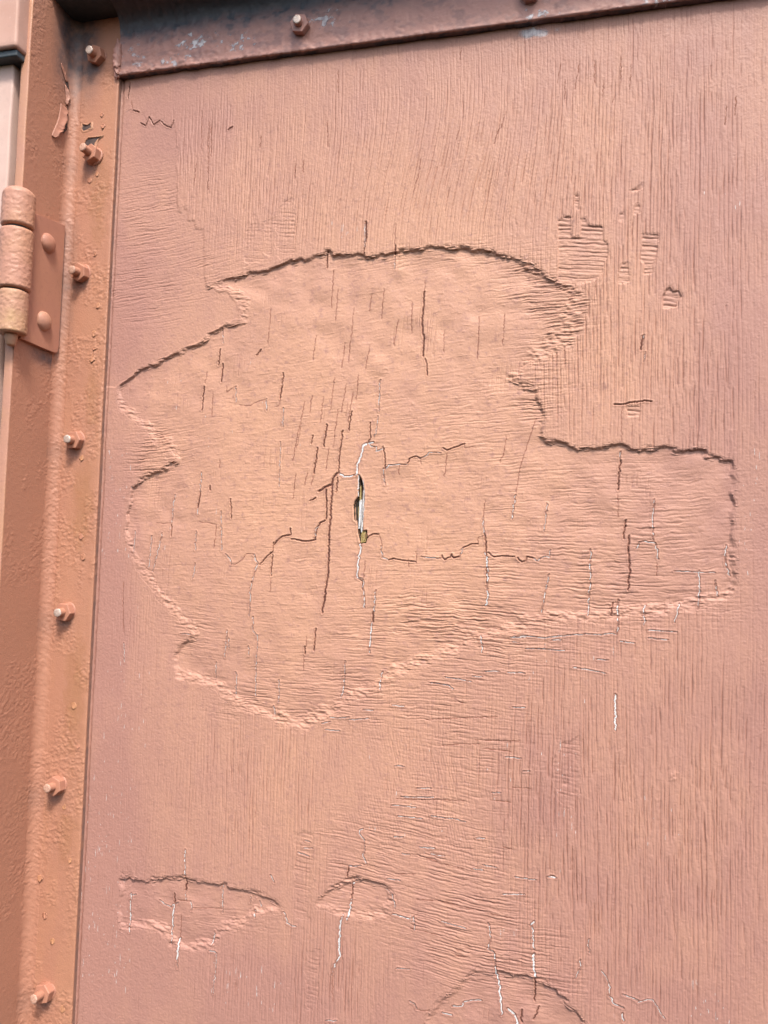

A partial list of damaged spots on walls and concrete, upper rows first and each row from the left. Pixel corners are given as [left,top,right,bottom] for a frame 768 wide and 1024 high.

peeling [51,63,70,137]
peeling [80,112,105,147]
crack [511,400,730,730]